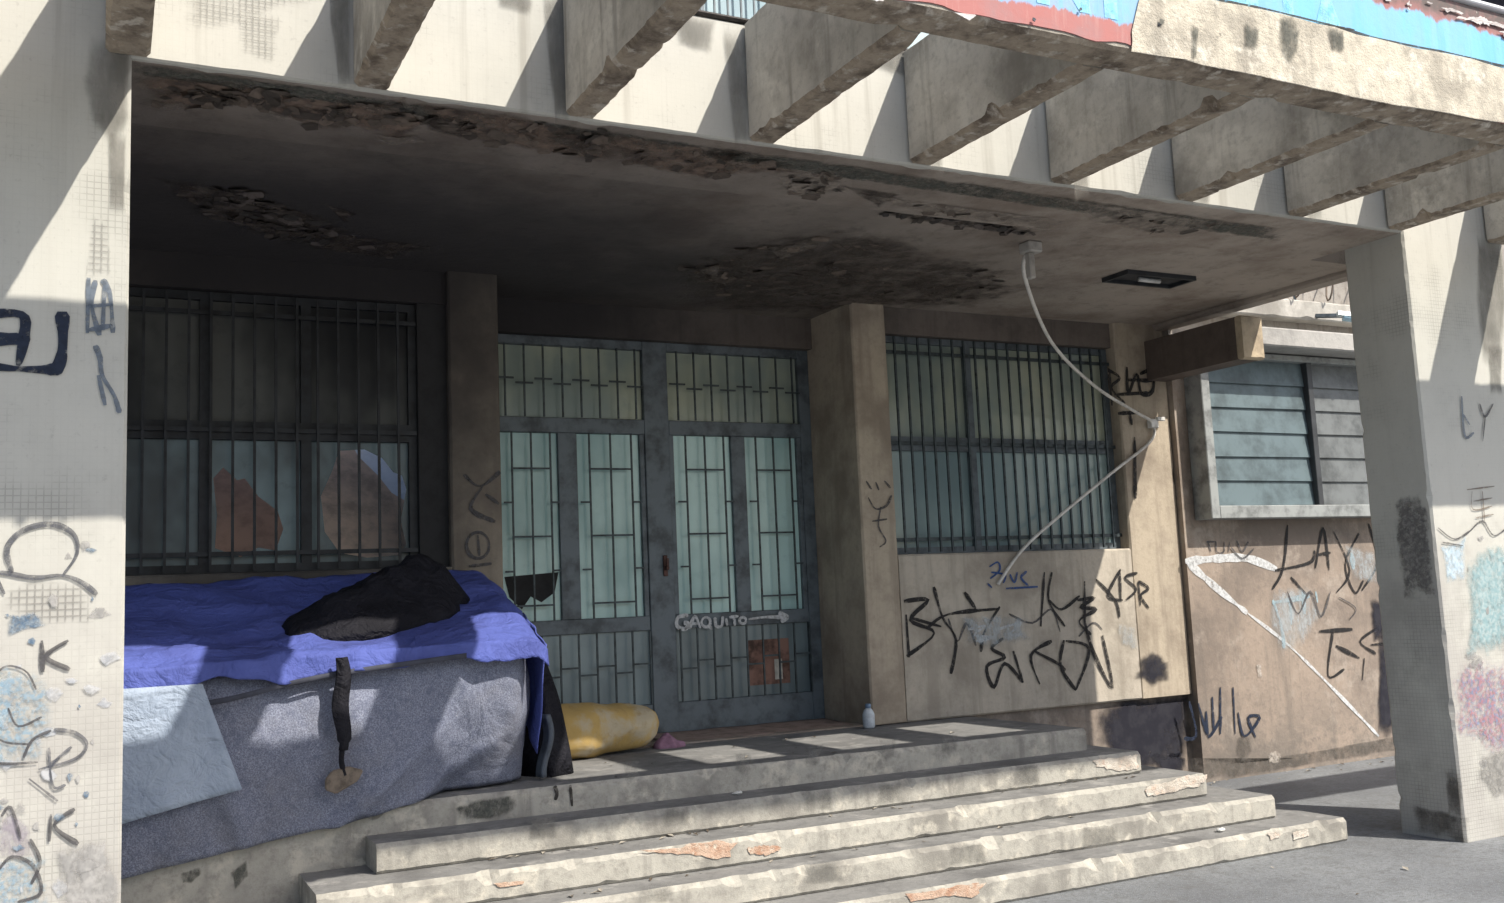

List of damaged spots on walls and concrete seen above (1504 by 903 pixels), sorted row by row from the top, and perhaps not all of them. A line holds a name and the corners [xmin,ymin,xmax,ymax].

spalling [143,78,1044,236]
water stain [98,0,1268,238]
spalling [1063,200,1216,235]
spalling [1131,0,1504,123]
spalling [642,840,781,859]
spalling [905,883,986,902]